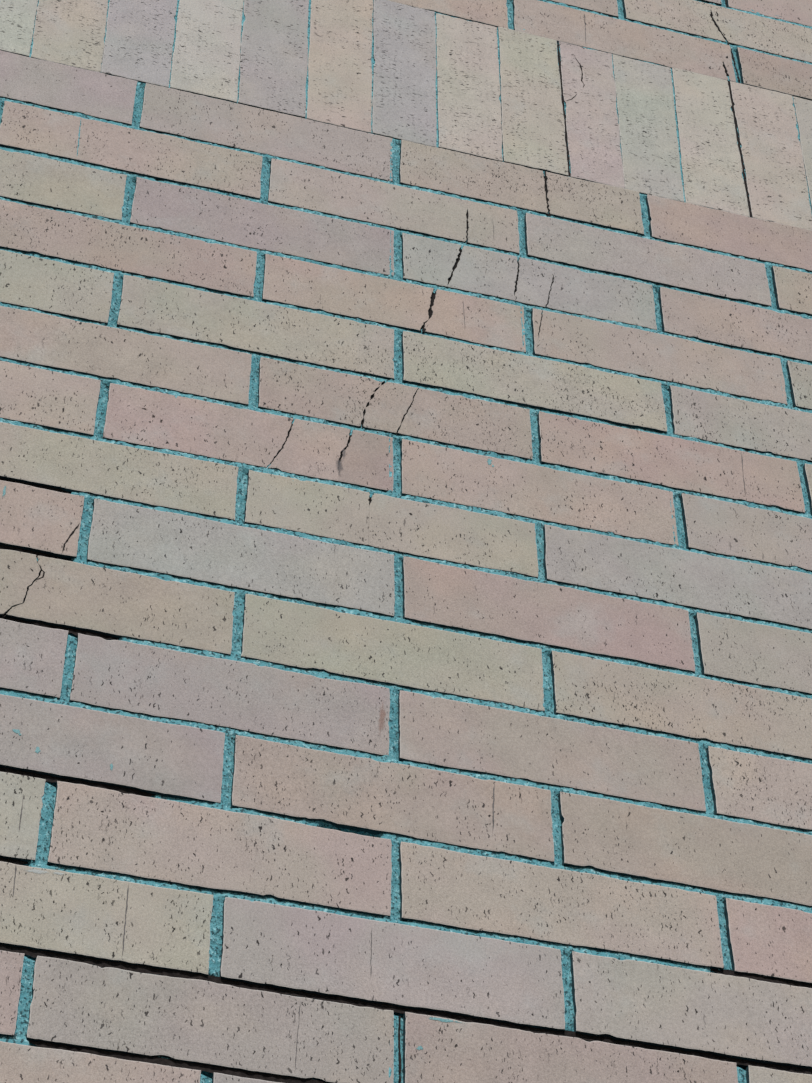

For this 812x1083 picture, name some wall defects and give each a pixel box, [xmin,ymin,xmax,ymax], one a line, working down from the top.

crack [710,0,752,218]
crack [420,211,494,333]
crack [338,381,385,470]
crack [2,524,79,617]